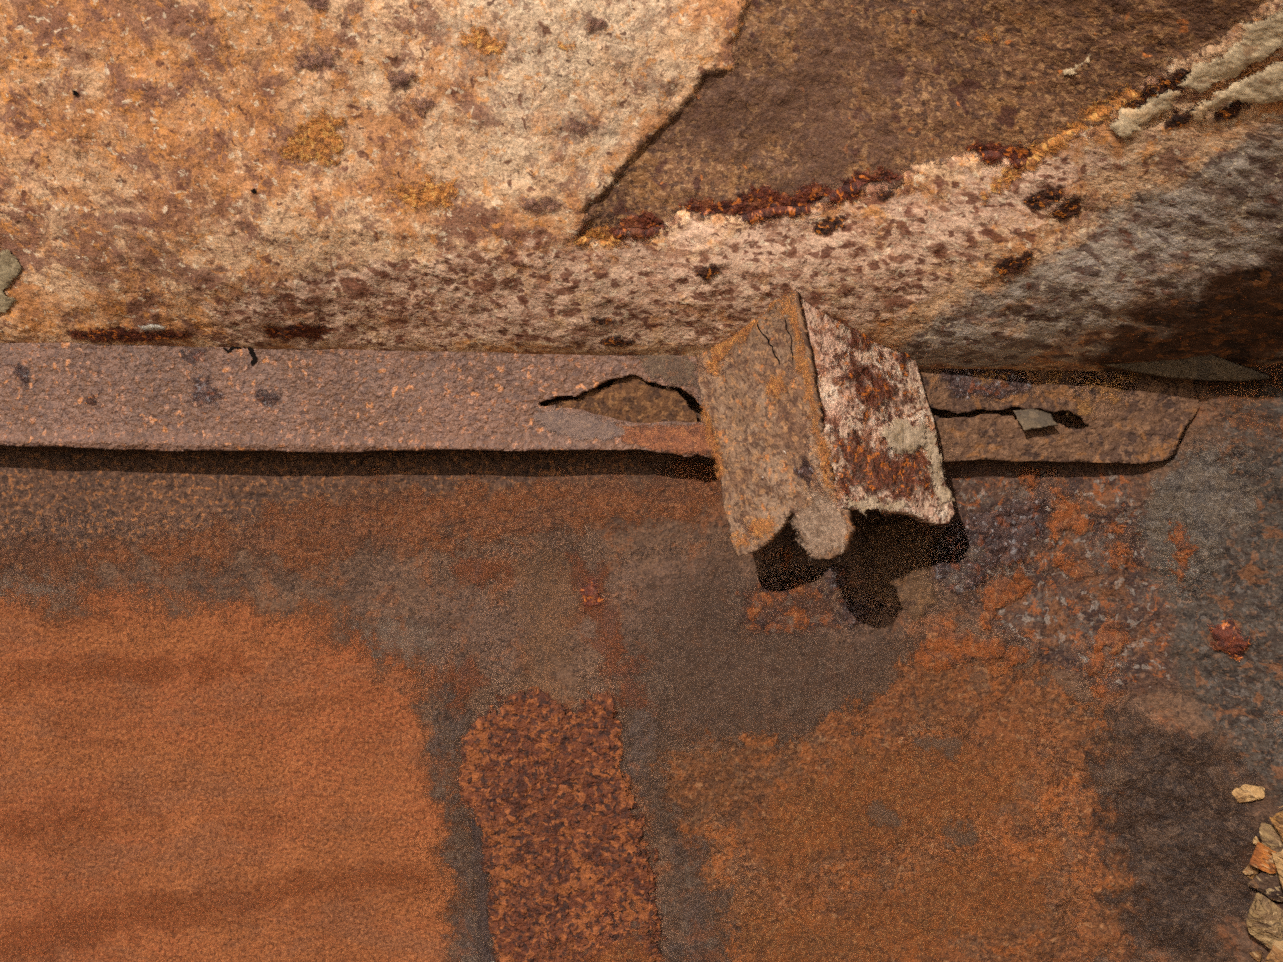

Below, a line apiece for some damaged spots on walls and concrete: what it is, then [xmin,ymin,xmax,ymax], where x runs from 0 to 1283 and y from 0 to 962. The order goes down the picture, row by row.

peeling [580,0,1273,245]
peeling [0,249,21,313]
rust [67,325,222,408]
rust [263,322,336,340]
rust [574,165,904,248]
rust [0,405,724,962]
leakage [516,547,579,705]
rust [650,462,1150,962]